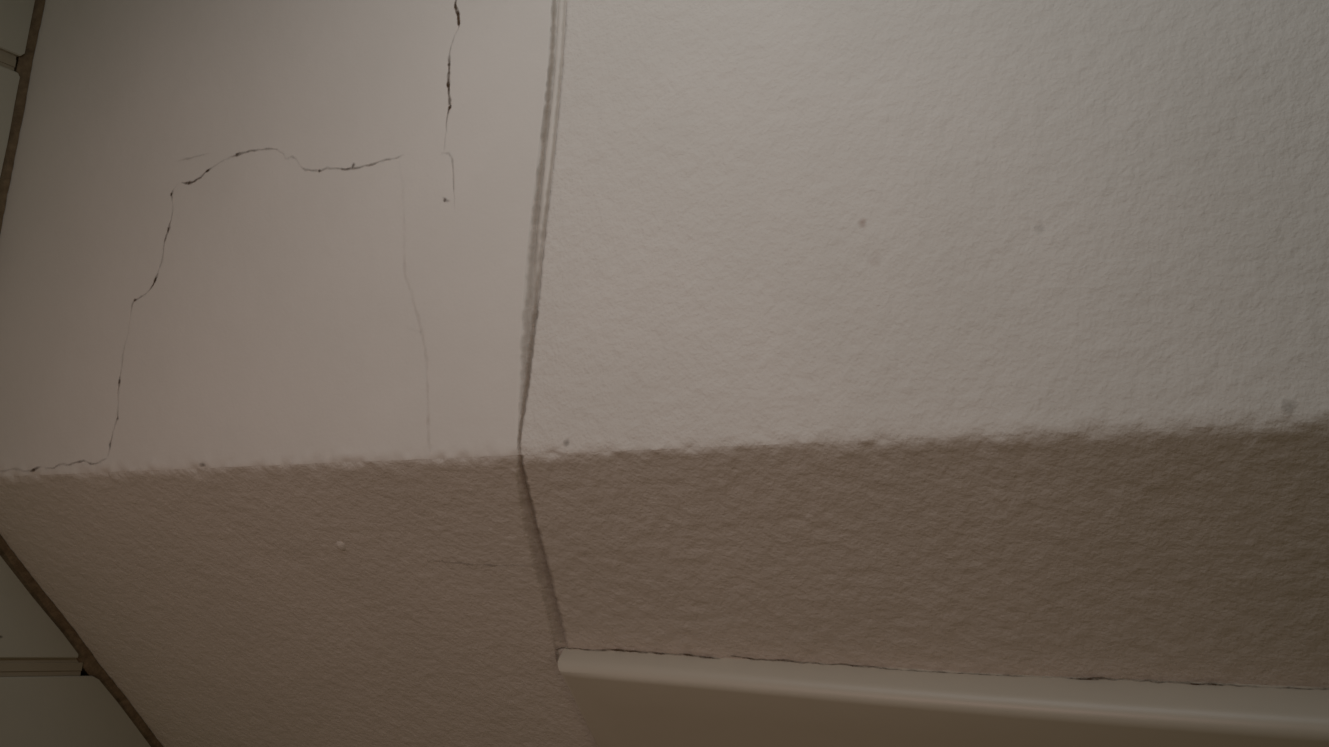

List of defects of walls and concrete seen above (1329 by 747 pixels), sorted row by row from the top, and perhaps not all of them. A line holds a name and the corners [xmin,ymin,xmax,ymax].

crack [445,61,453,111]